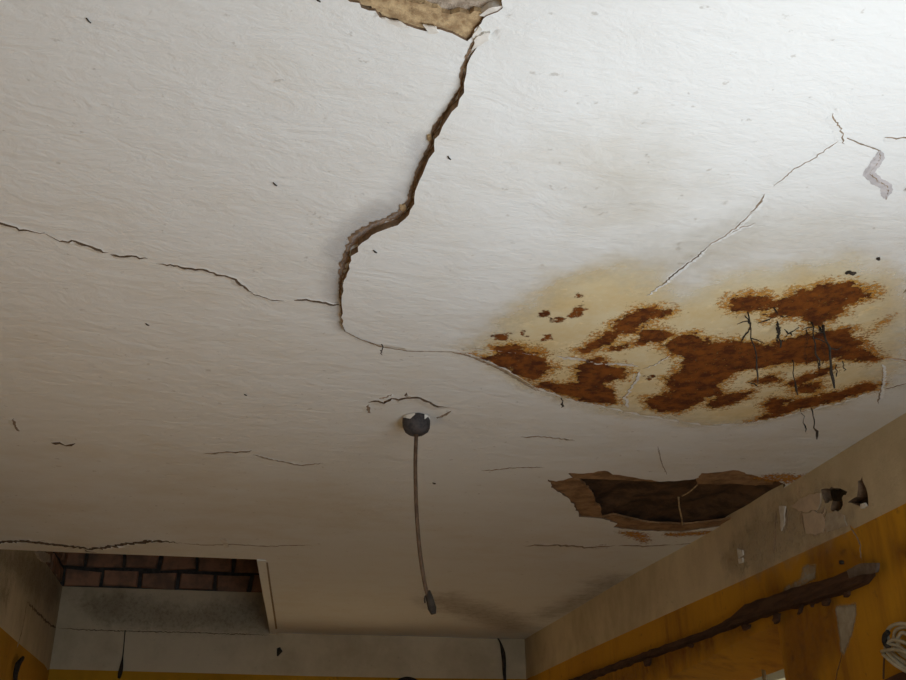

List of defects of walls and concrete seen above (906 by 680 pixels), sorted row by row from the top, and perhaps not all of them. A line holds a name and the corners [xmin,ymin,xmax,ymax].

spalling [359,0,502,39]
crack [884,134,906,143]
crack [0,31,670,408]
crack [647,113,848,296]
corrosion [460,263,906,425]
crack [362,393,453,419]
crack [204,450,321,466]
spalling [549,470,783,531]
crack [0,537,305,552]